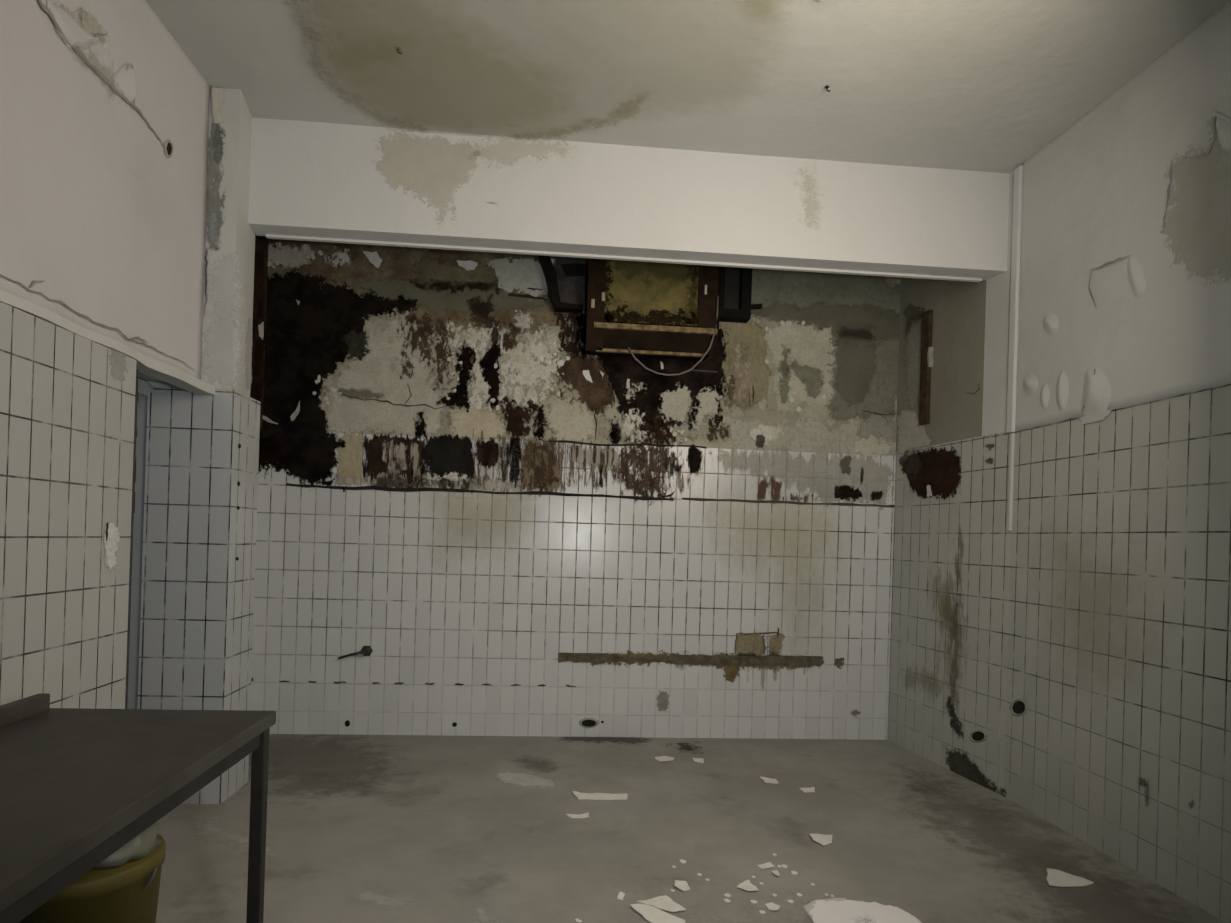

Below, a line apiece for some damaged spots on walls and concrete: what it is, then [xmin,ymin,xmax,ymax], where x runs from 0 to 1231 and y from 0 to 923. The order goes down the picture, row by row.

peeling [47,0,109,51]
crack [38,0,165,147]
peeling [113,62,138,109]
flaking render [204,87,226,316]
peeling [267,242,382,269]
peeling [1160,111,1231,282]
peeling [313,257,934,458]
rust [586,627,844,683]
damp [945,529,1007,798]